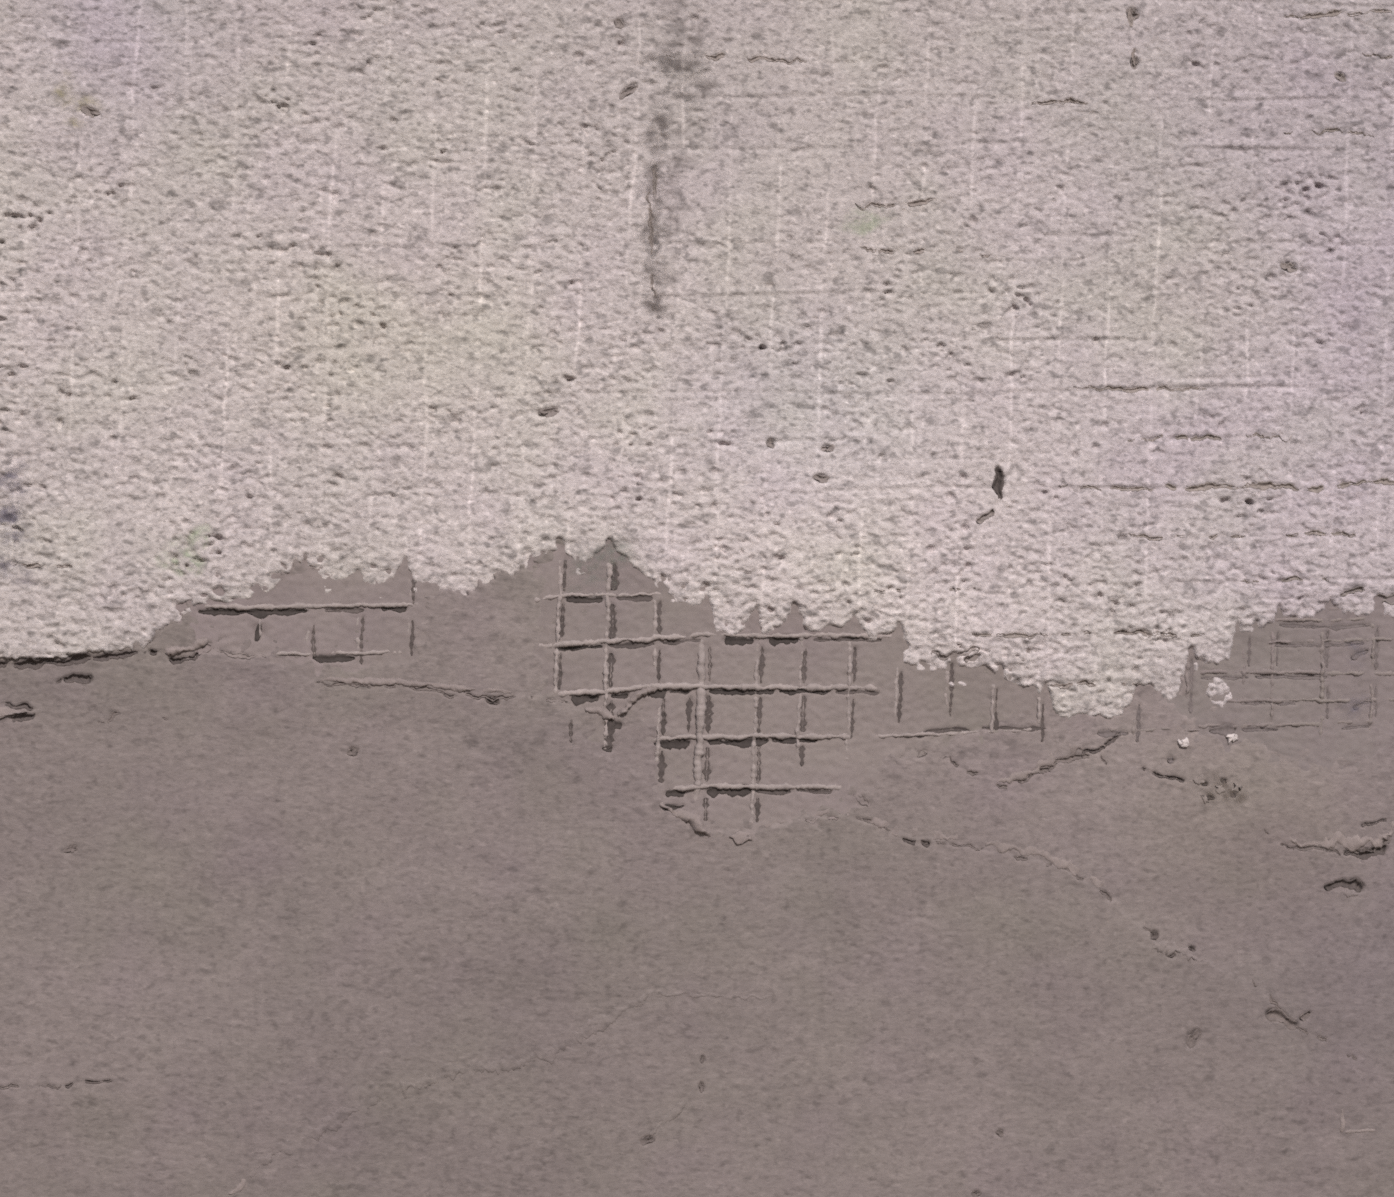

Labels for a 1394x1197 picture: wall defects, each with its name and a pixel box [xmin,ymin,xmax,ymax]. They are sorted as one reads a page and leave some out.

spalling [175,551,439,677]
spalling [528,539,1048,845]
spalling [1097,595,1394,771]
crack [945,732,1121,789]
crack [1142,759,1185,783]
peeling [1193,775,1245,803]
crack [764,795,1154,937]
crack [1264,818,1394,898]
crack [1253,981,1357,1060]